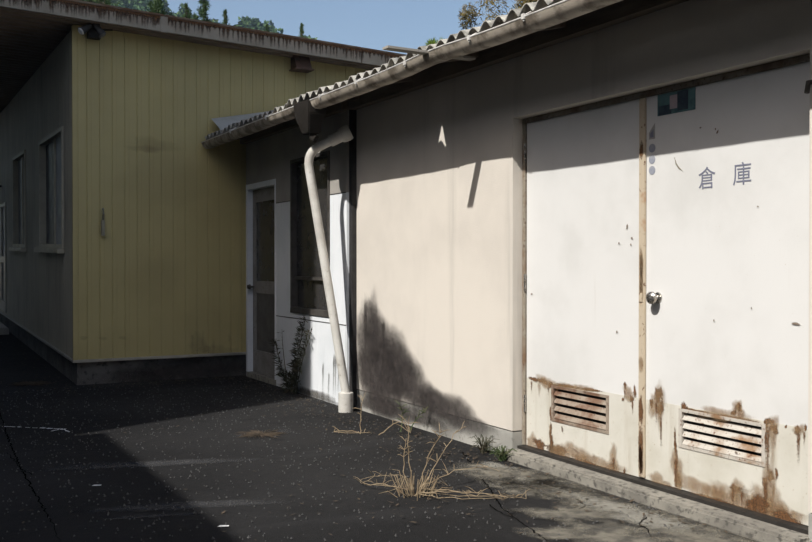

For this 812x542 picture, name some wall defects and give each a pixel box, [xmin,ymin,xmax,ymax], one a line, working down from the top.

rust [3,0,400,62]
water stain [358,305,485,432]
rust [528,382,664,476]
rust [652,402,807,524]